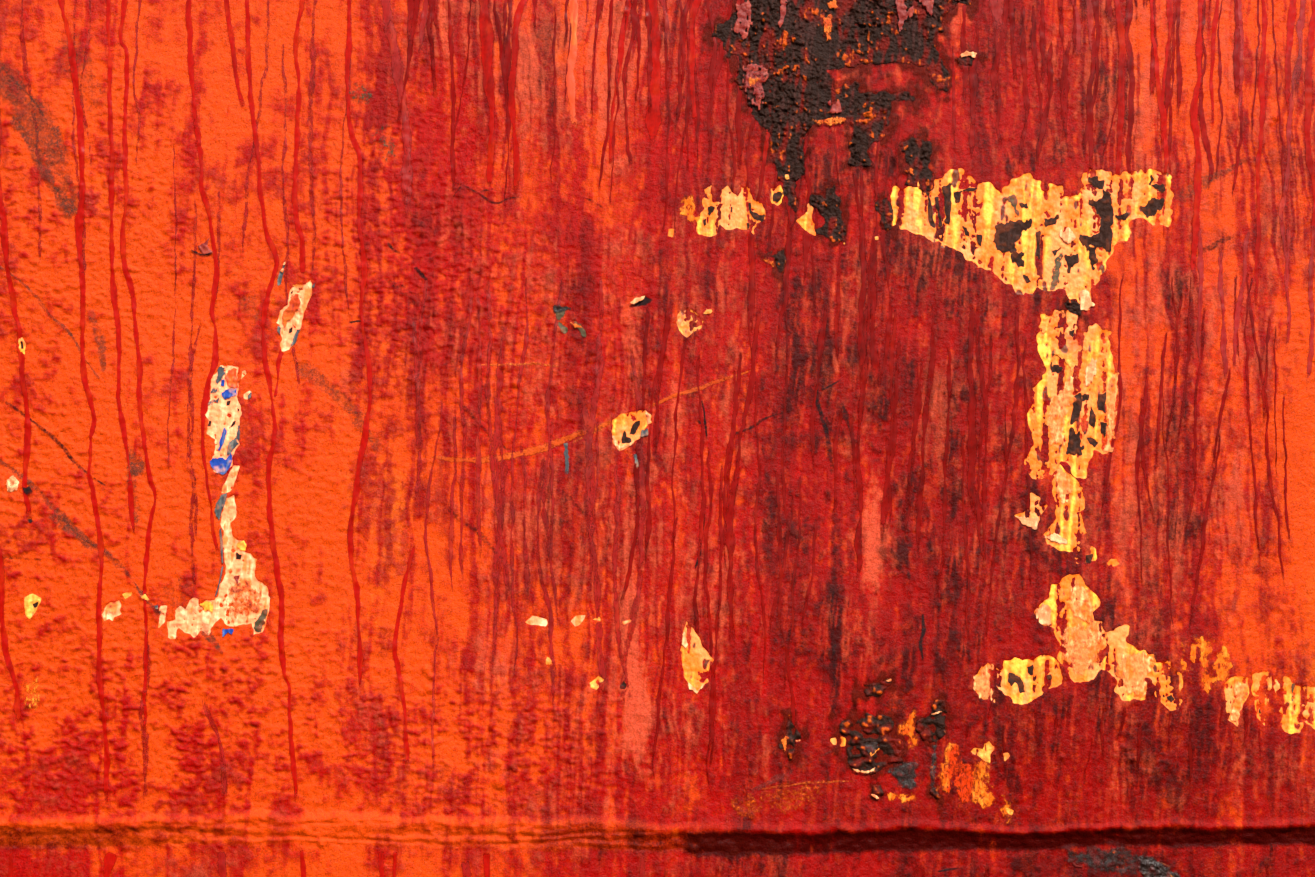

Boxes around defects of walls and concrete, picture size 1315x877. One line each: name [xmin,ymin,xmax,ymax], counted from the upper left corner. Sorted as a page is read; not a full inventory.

rust [702,0,979,247]
peeling [680,185,787,281]
peeling [272,262,316,351]
peeling [612,410,651,451]
peeling [890,168,1315,734]
peeling [102,365,270,639]
peeling [680,622,714,693]
rust [778,708,809,764]
rust [828,671,954,789]